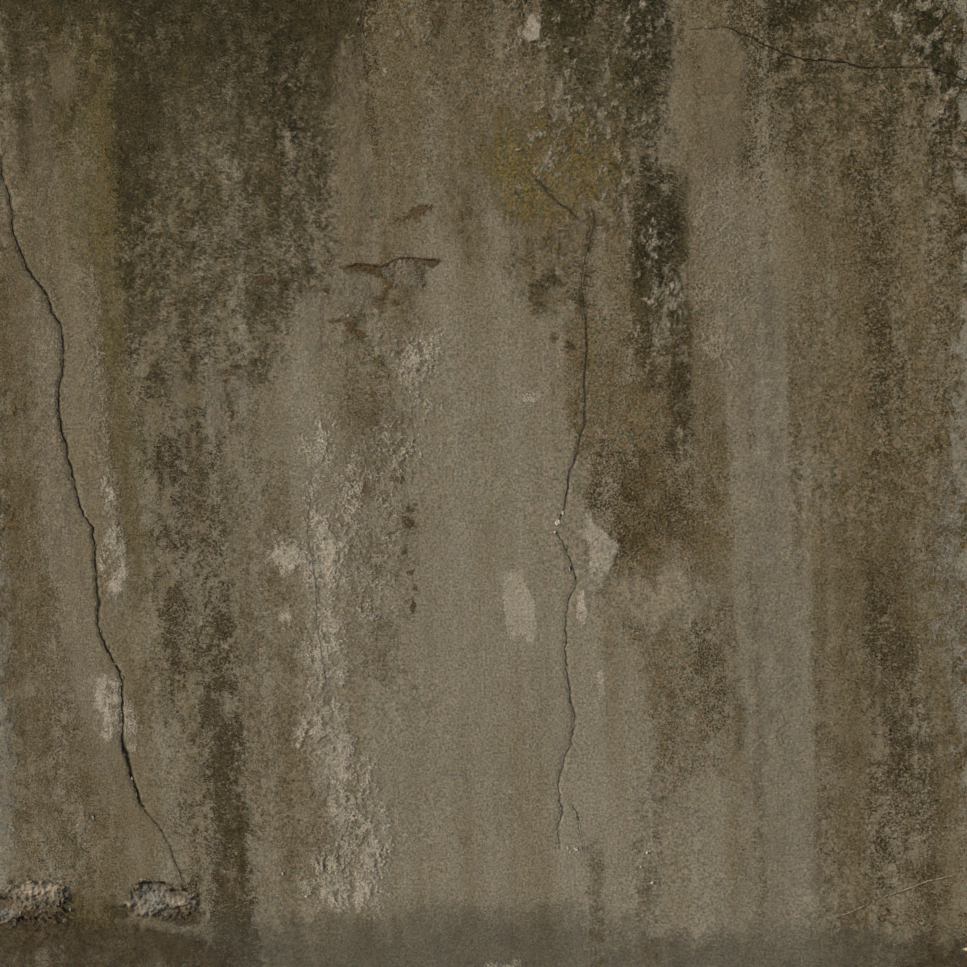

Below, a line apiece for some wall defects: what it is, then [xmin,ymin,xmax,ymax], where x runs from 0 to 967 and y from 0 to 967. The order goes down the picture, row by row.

crack [0,163,183,884]
leakage [0,0,445,967]
corrosion [340,256,442,313]
corrosion [395,204,434,223]
leakage [343,0,776,967]
crack [535,179,595,852]
leakage [676,0,967,967]
crack [690,26,967,82]
spalling [0,878,83,934]
spalling [118,873,208,926]